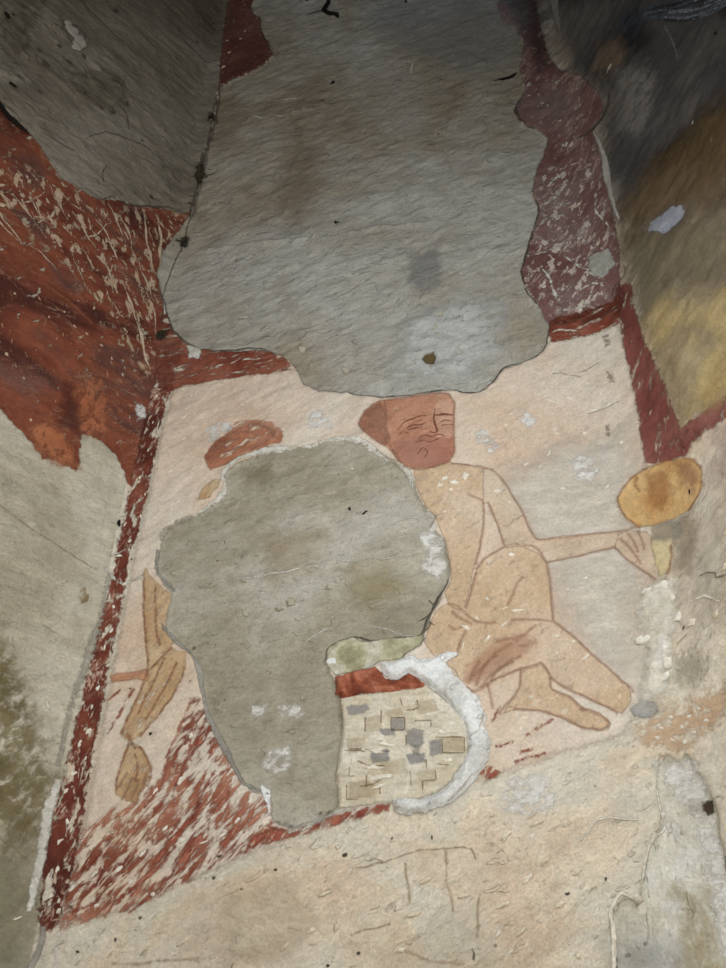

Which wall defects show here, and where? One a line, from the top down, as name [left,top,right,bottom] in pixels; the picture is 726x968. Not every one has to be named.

flaking render [0,0,246,377]
crack [0,84,268,351]
flaking render [648,205,685,234]
peeling [75,379,109,435]
peeling [29,417,78,467]
flaking render [326,633,425,698]
flaking render [630,701,658,718]
spalling [608,707,726,968]